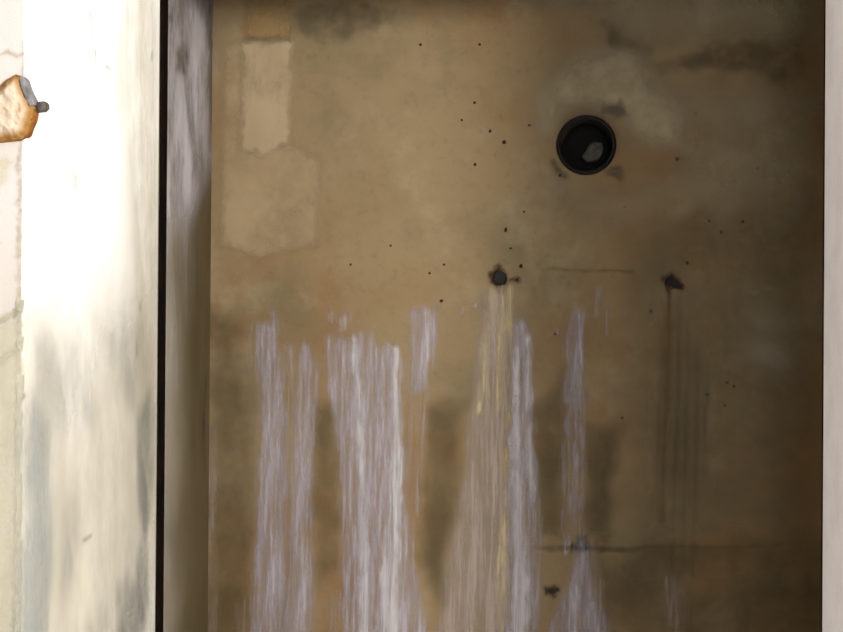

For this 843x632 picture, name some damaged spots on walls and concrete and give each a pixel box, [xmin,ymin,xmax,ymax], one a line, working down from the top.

water stain [254,326,311,632]
water stain [328,338,425,632]
water stain [417,309,435,385]
water stain [445,286,604,632]